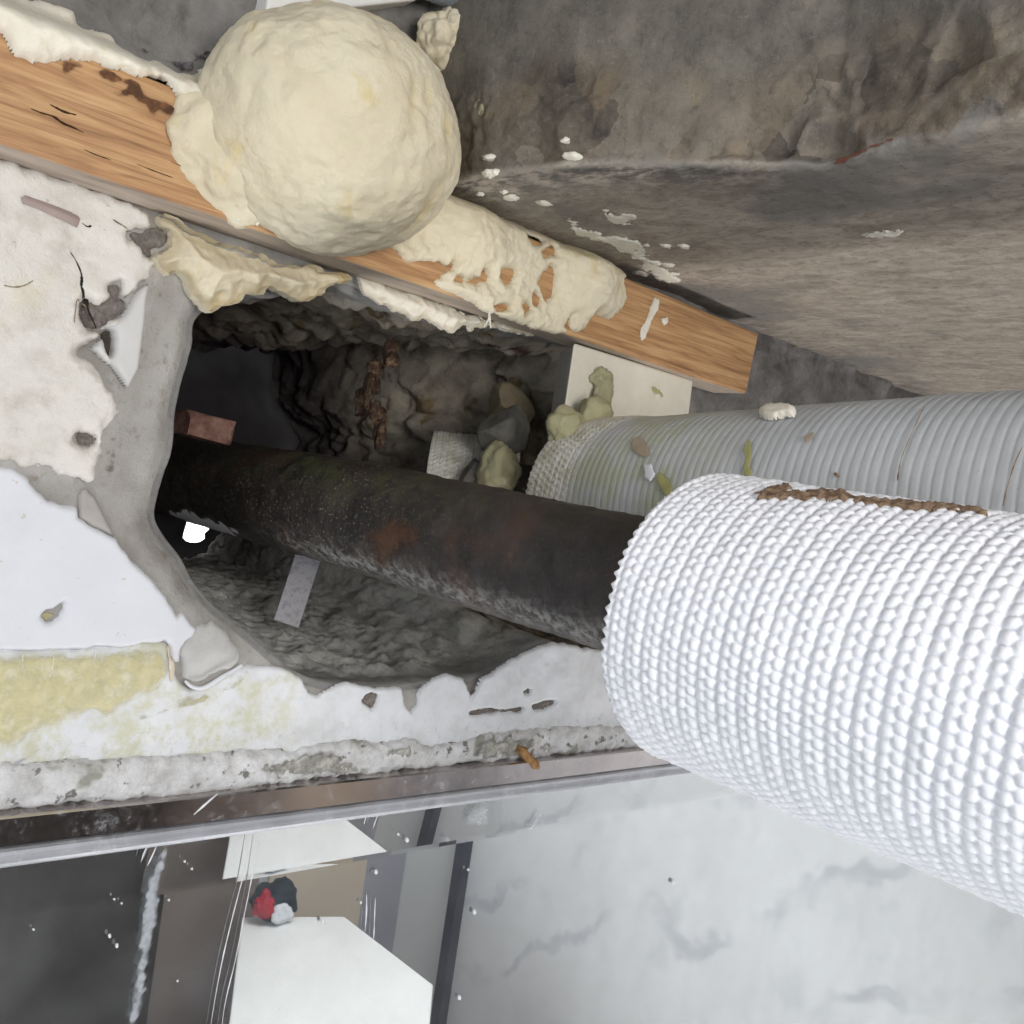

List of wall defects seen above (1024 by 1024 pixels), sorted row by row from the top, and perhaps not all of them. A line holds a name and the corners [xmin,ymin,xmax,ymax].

crack [70,252,97,329]
peeling [0,160,621,765]
damp [0,645,175,742]